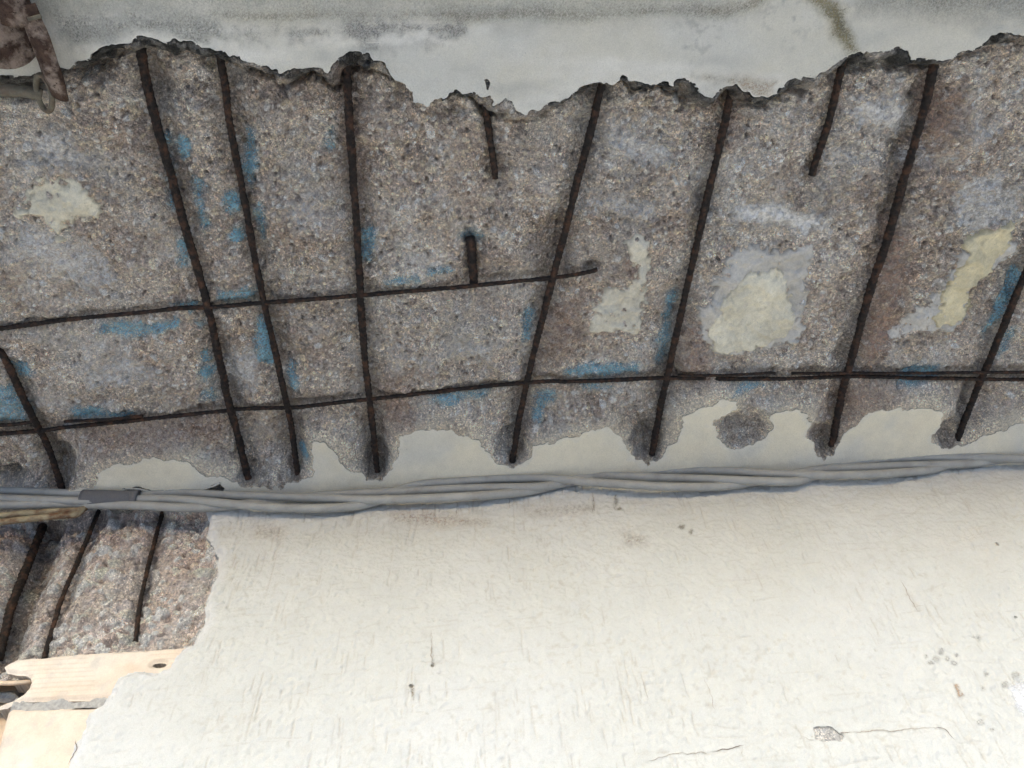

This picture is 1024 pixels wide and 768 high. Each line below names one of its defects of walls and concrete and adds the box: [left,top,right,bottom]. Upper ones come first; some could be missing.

spalling [0,32,1024,491]
rust [0,48,1024,489]
rust [0,523,47,661]
rust [41,509,101,659]
spalling [0,509,218,681]
rust [133,511,164,642]